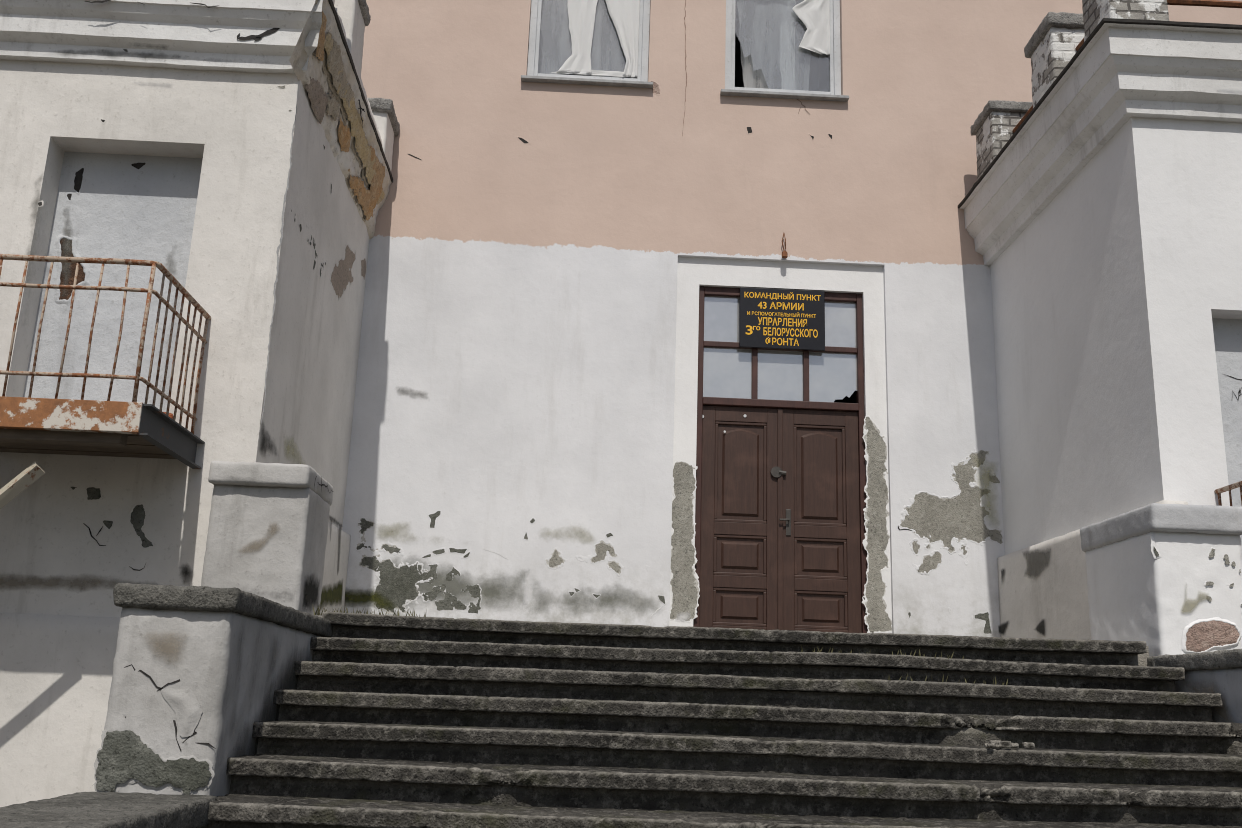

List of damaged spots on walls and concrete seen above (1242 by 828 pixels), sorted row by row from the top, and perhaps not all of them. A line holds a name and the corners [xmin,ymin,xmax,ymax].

peeling [306,0,385,222]
crack [680,0,688,136]
peeling [291,210,367,303]
peeling [354,517,483,615]
peeling [427,510,442,529]
peeling [545,532,624,577]
water stain [600,594,625,604]
peeling [657,460,700,623]
peeling [862,415,1004,636]
spalling [92,730,215,795]